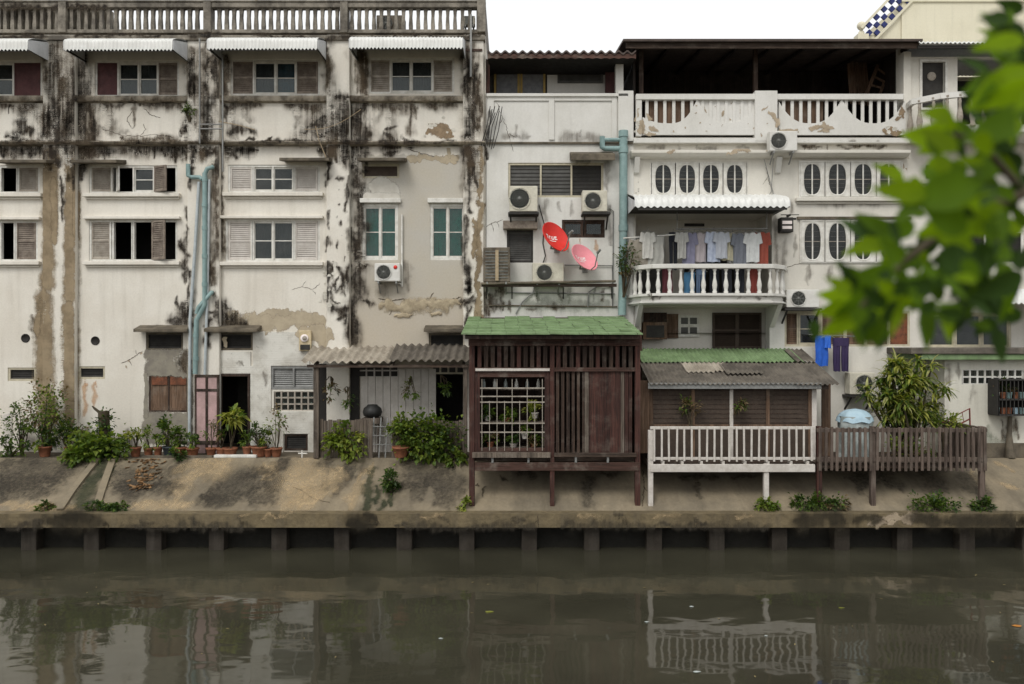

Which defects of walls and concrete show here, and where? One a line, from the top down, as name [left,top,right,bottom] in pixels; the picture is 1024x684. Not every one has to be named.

peeling [406,116,459,165]
peeling [748,106,835,137]
leakage [120,31,511,347]
peeling [221,261,349,348]